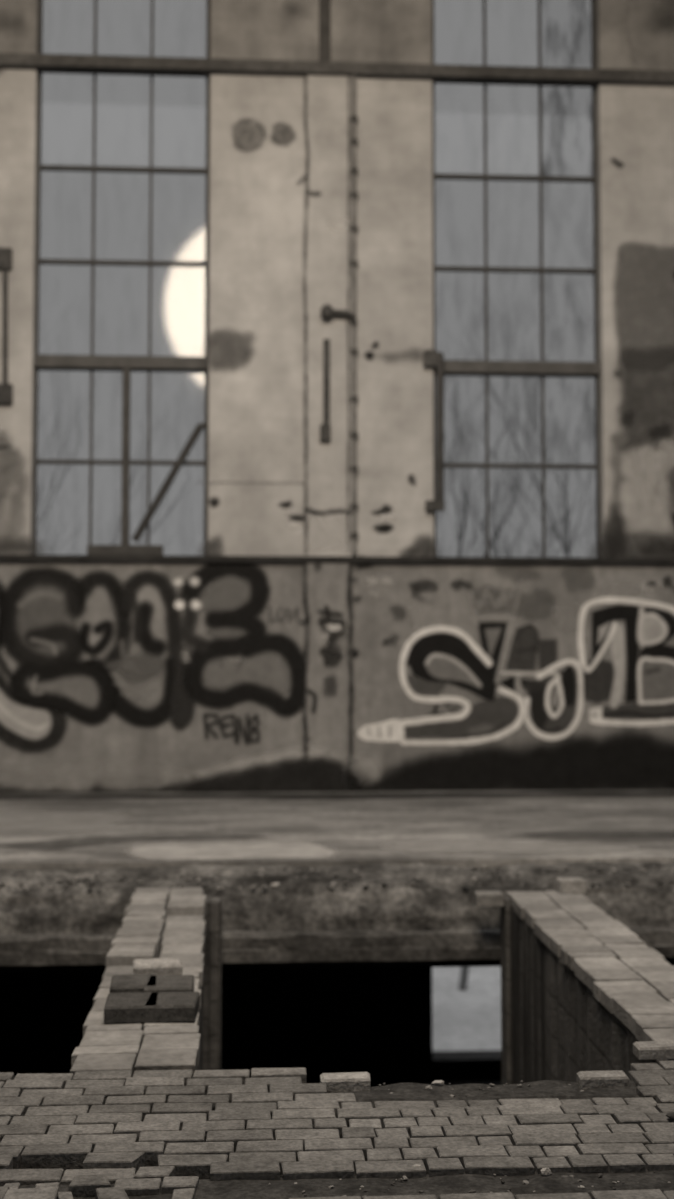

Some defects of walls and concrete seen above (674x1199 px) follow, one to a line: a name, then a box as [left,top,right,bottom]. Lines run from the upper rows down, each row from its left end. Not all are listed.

water stain [235,120,294,150]
water stain [207,332,252,369]
peeling [615,244,674,448]